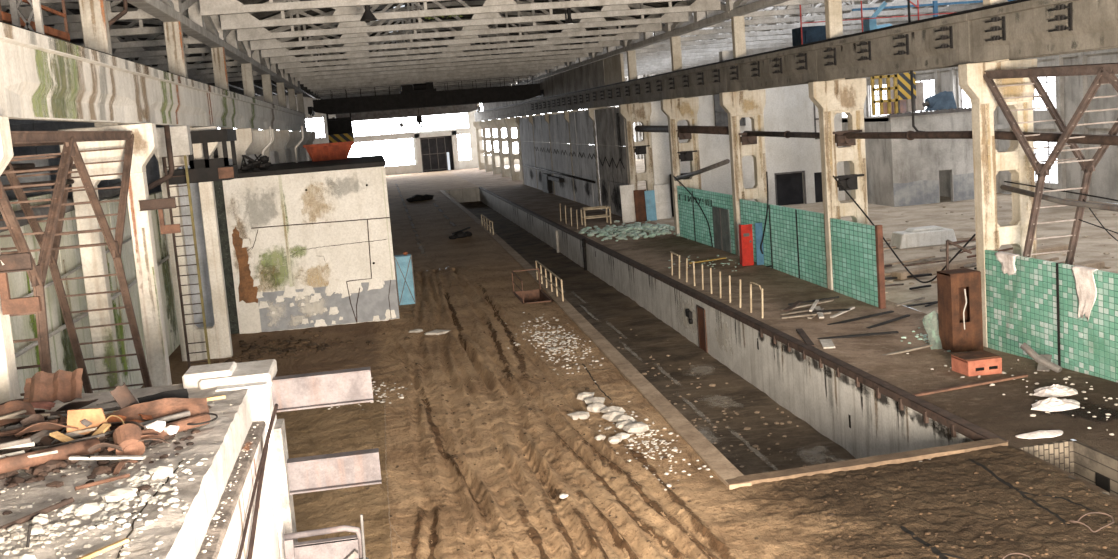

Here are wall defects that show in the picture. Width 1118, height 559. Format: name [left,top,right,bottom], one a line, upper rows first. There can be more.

damp [32,39,98,120]
peeling [230,219,385,327]
peeling [373,309,396,321]
crack [969,459,1095,525]
crack [900,526,965,559]